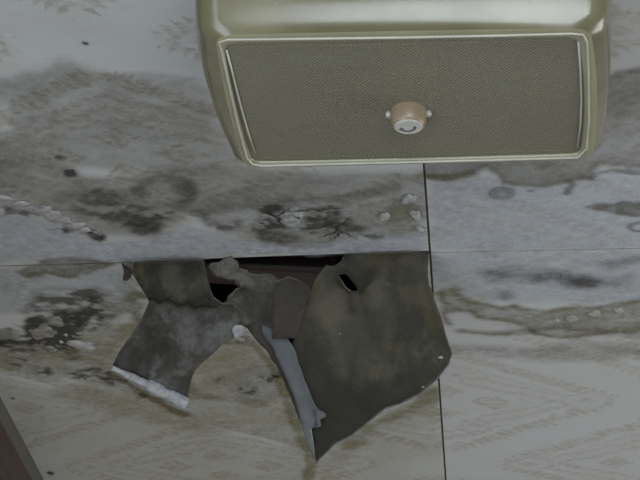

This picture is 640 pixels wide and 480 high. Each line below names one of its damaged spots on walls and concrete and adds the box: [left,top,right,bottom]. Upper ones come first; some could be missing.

leakage [425,160,640,233]
leakage [0,194,424,424]
leakage [437,289,551,337]
leakage [543,297,640,338]